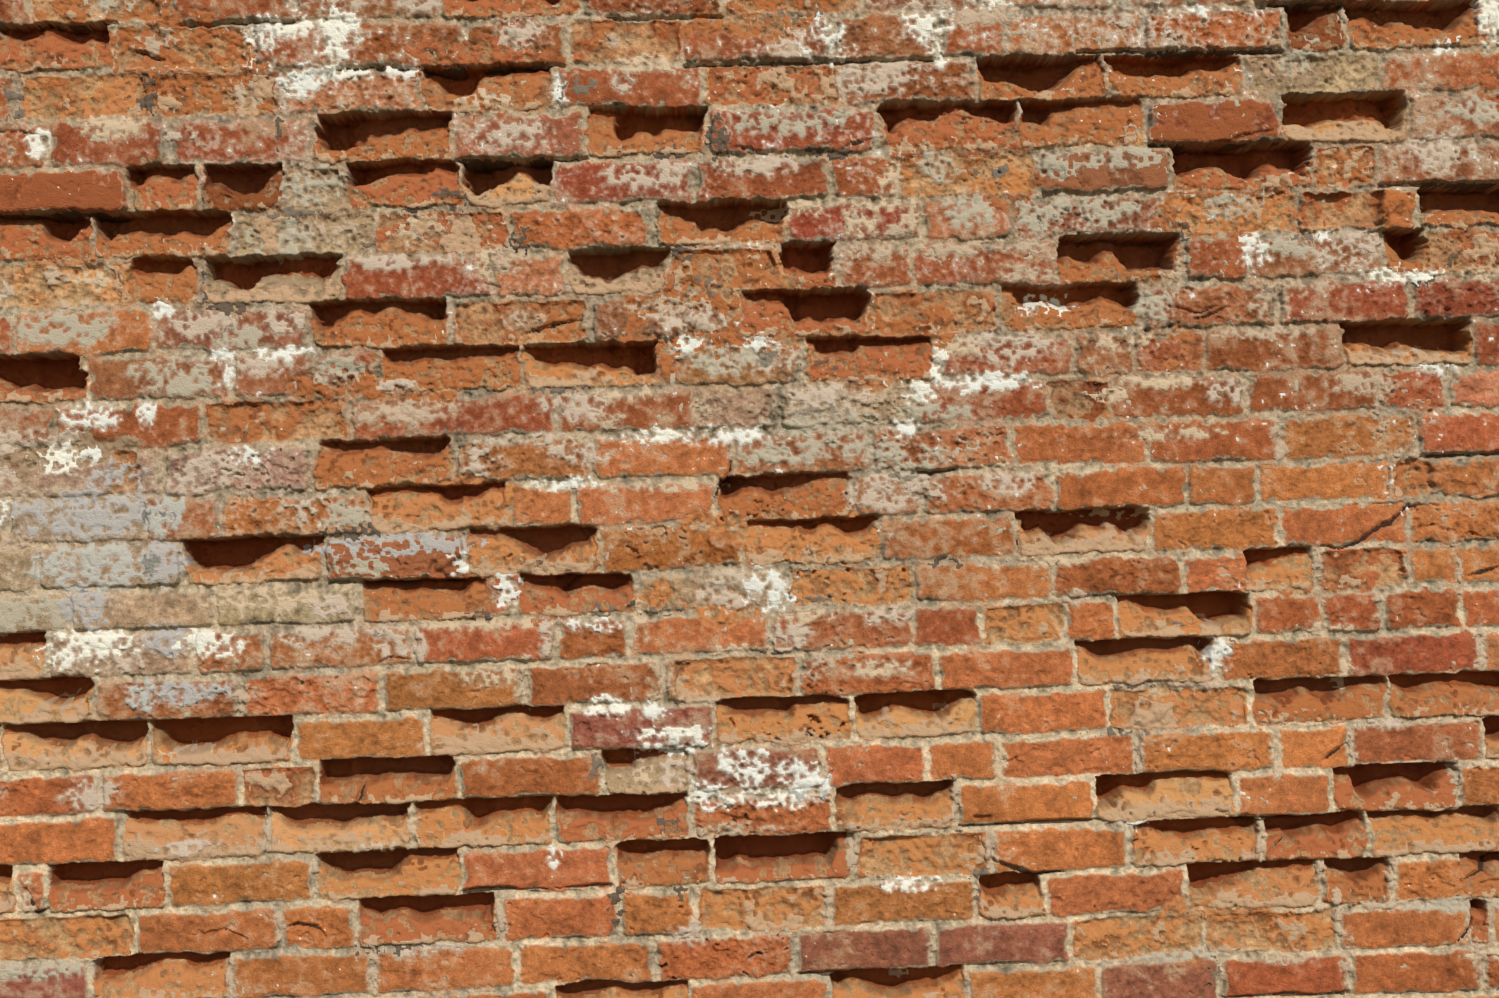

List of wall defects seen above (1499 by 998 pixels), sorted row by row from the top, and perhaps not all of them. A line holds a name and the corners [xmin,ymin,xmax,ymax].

water stain [1244,24,1319,77]
water stain [1188,76,1245,138]
water stain [1368,68,1444,172]
peeling [594,140,799,196]
peeling [0,233,1062,680]
peeling [106,623,236,713]
spalling [678,622,846,714]
spalling [433,705,563,725]
spalling [3,739,448,858]
spalling [558,748,696,816]
spalling [836,780,952,801]
peeling [352,826,548,853]